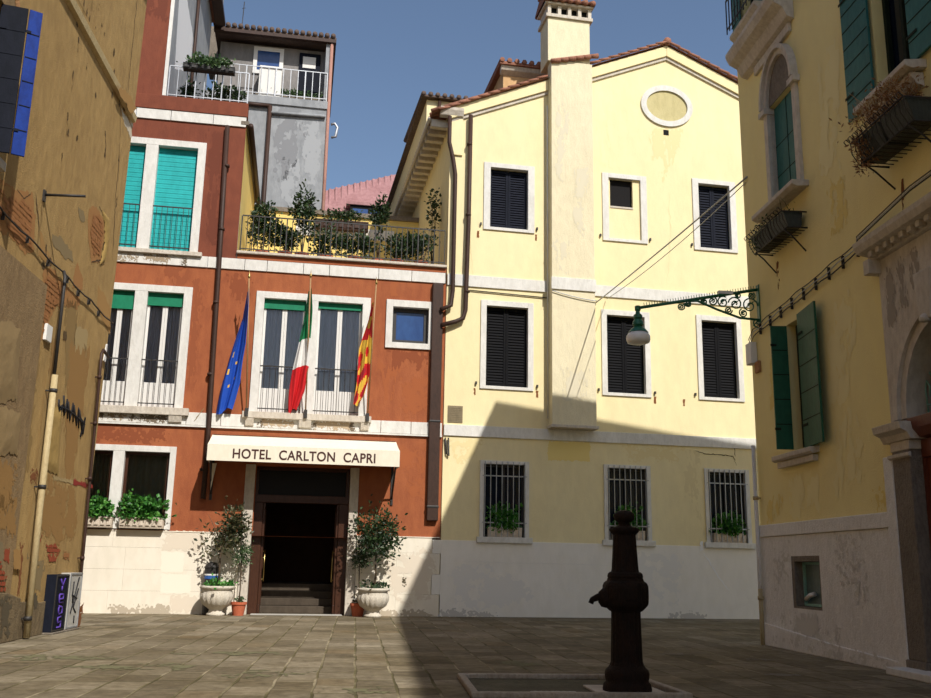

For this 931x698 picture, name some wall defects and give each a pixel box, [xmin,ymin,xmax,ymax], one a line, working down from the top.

flaking render [0,180,83,340]